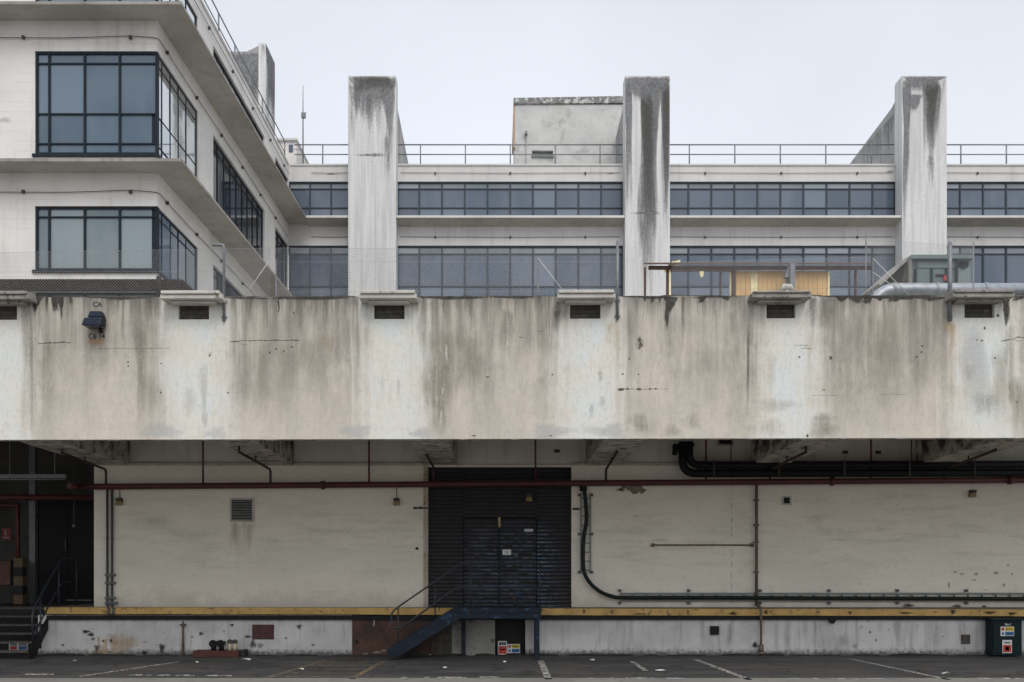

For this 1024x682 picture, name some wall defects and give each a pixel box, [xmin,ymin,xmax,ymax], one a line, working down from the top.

water stain [350,77,396,158]
water stain [625,77,670,234]
water stain [884,77,946,193]
water stain [33,297,152,317]
water stain [623,296,677,325]
water stain [1003,296,1024,324]